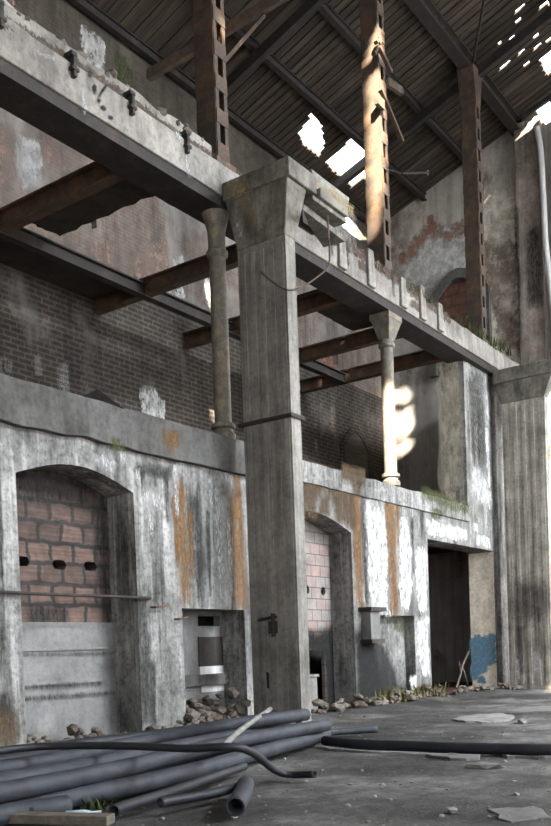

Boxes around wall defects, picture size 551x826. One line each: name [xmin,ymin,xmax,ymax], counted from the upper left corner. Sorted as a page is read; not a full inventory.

spalling [3,0,215,159]
flaking render [334,213,466,323]
rust [173,482,193,603]
rust [228,474,245,607]
rust [385,502,400,614]